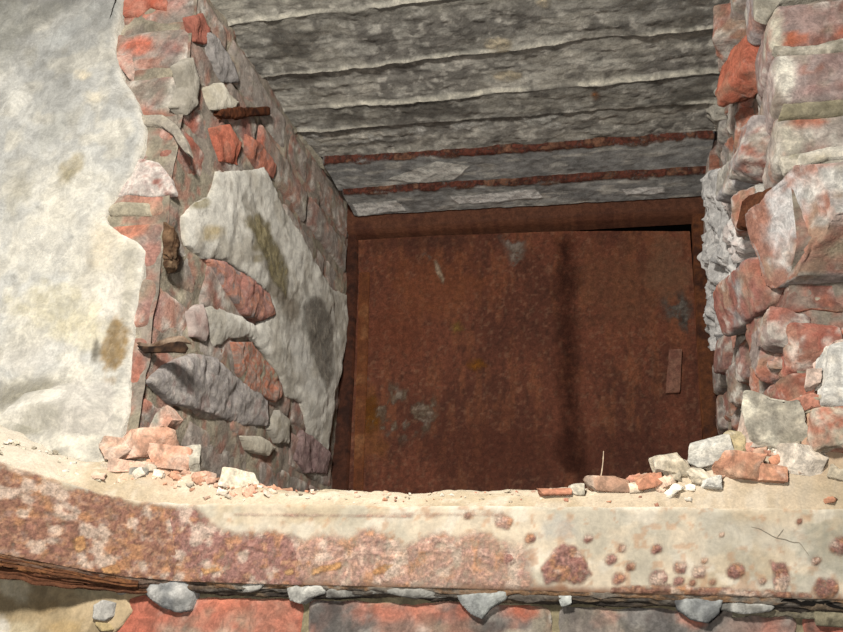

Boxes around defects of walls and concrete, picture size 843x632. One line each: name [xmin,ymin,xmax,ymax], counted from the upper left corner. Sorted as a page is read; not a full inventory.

spalling [109,0,239,267]
corrosion [324,130,714,166]
corrosion [343,166,706,195]
spalling [697,0,843,435]
peeling [131,167,348,456]
corrosion [0,464,843,619]
crack [781,599,843,610]